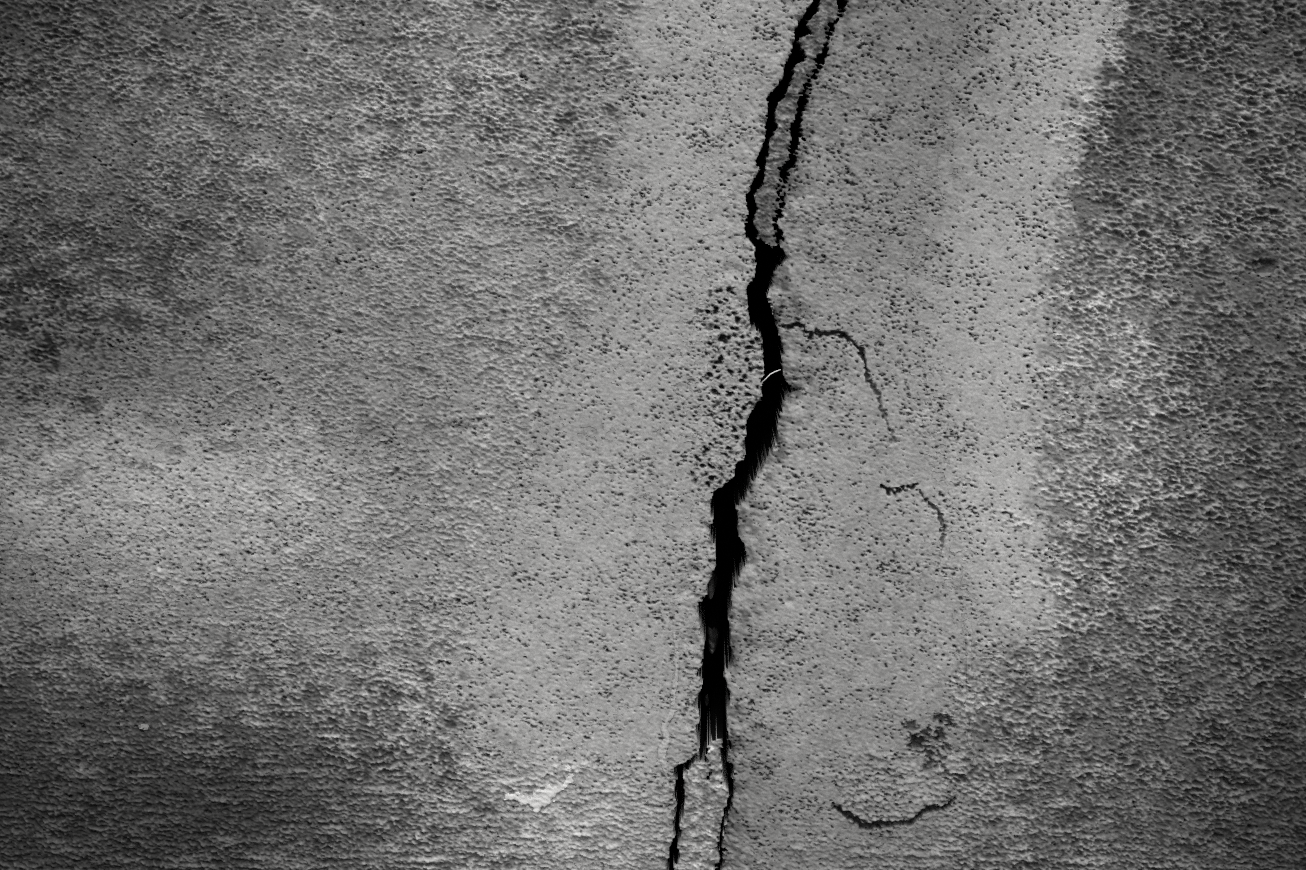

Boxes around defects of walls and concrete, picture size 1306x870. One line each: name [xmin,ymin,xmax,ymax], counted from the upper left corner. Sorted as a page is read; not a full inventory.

crack [666,0,897,870]
crack [880,483,947,576]